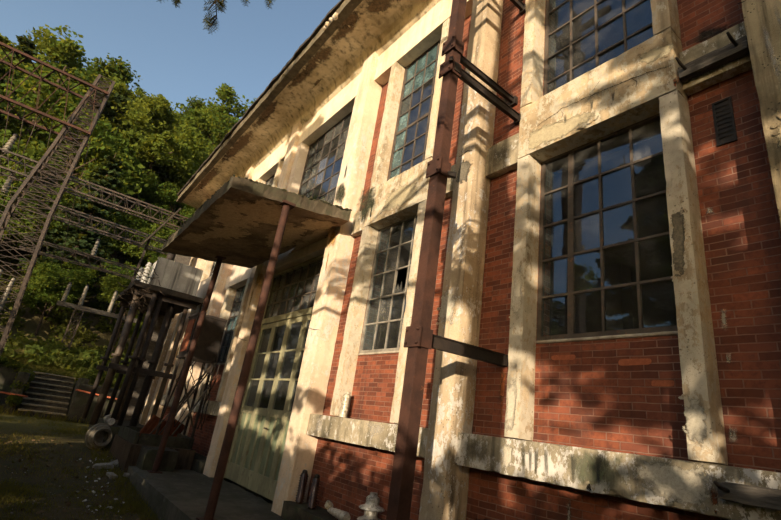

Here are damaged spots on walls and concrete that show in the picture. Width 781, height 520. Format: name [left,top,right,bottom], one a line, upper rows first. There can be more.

crack [539,65,671,125]
leakage [522,450,548,472]